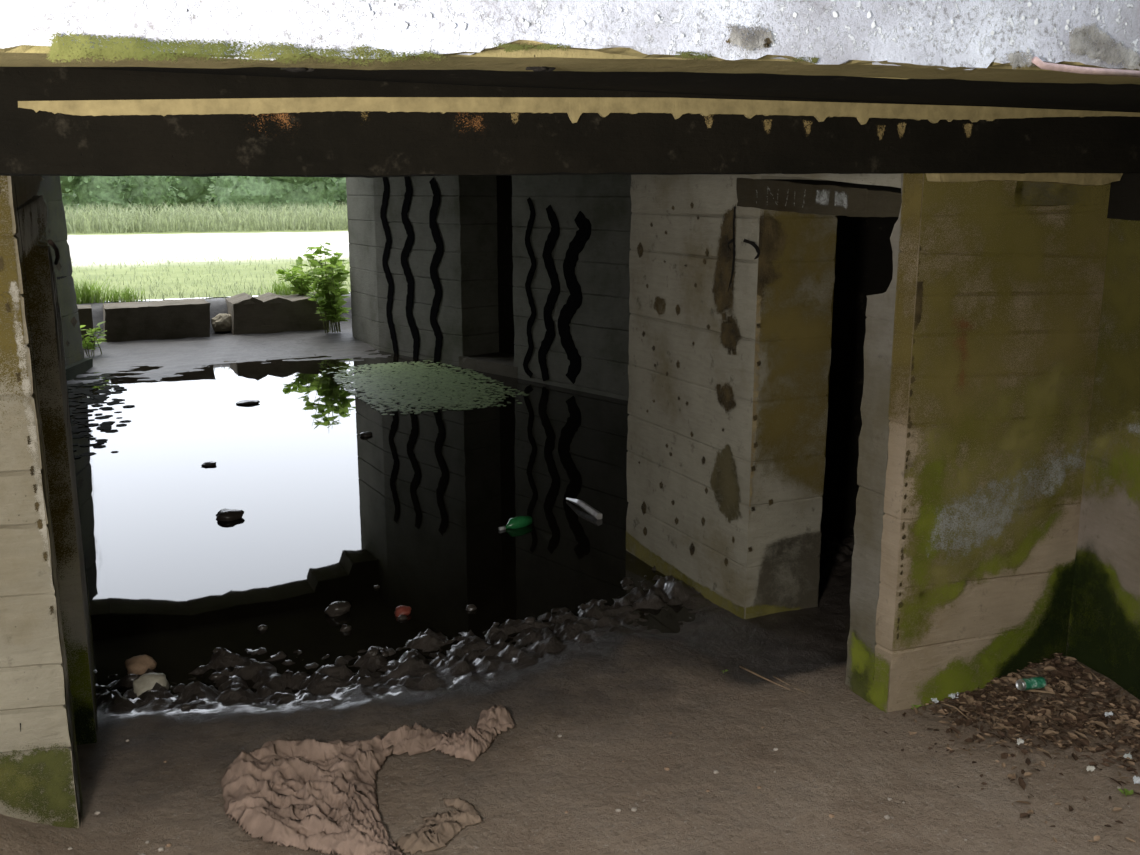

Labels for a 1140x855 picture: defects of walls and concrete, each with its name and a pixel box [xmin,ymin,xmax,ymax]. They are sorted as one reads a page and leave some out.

spalling [726,22,775,53]
spalling [1006,23,1140,78]
damp [0,176,78,574]
spalling [709,204,790,523]
damp [887,173,923,433]
damp [925,441,1085,564]
damp [0,741,78,829]